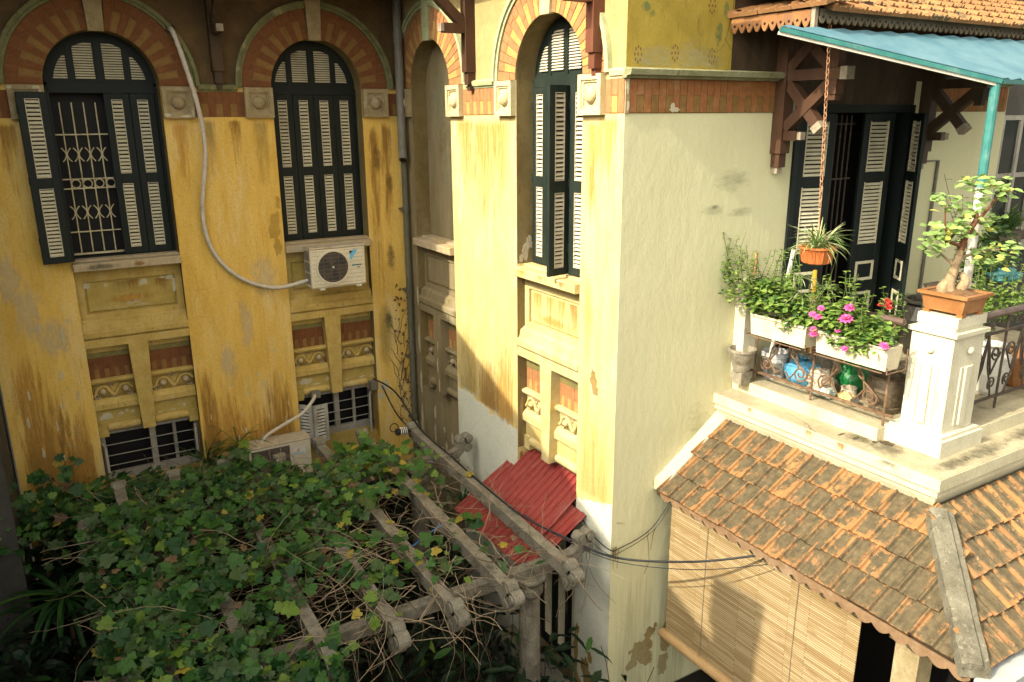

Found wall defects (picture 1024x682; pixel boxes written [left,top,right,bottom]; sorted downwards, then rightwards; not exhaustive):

leakage [370,127,391,221]
peeling [519,235,533,262]
peeling [625,622,670,675]